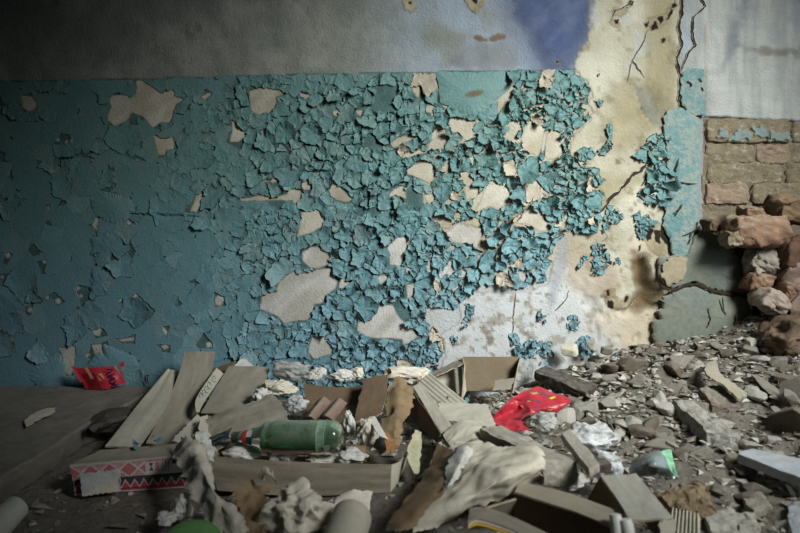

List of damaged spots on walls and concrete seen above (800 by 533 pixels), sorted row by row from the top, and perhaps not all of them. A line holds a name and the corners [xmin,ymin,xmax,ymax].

crack [627,28,651,82]
crack [675,0,706,110]
flaking render [29,0,800,398]
crack [595,150,649,222]
crack [659,282,747,327]